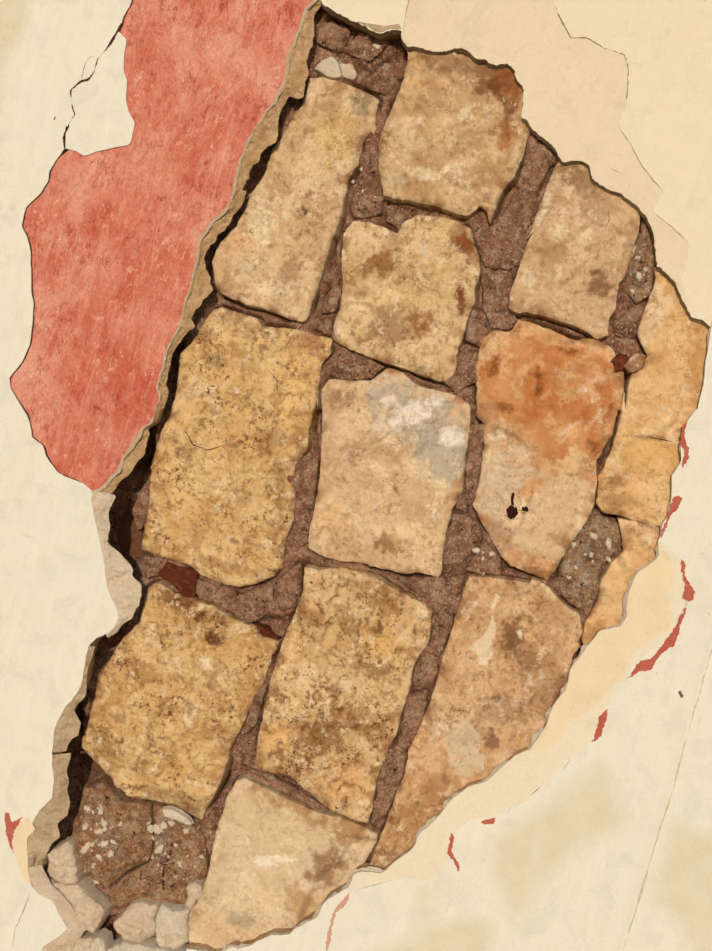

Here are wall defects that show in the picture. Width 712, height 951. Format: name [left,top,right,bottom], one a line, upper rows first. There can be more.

crack [556,8,629,100]
crack [617,129,662,190]
crack [10,0,133,482]
peeling [10,0,524,638]
flaking render [416,117,711,840]
flaking render [5,646,95,951]
peeling [162,805,195,825]
flaking render [220,850,410,951]
peeling [447,833,460,871]
leakage [355,695,642,951]
leakage [637,801,712,951]